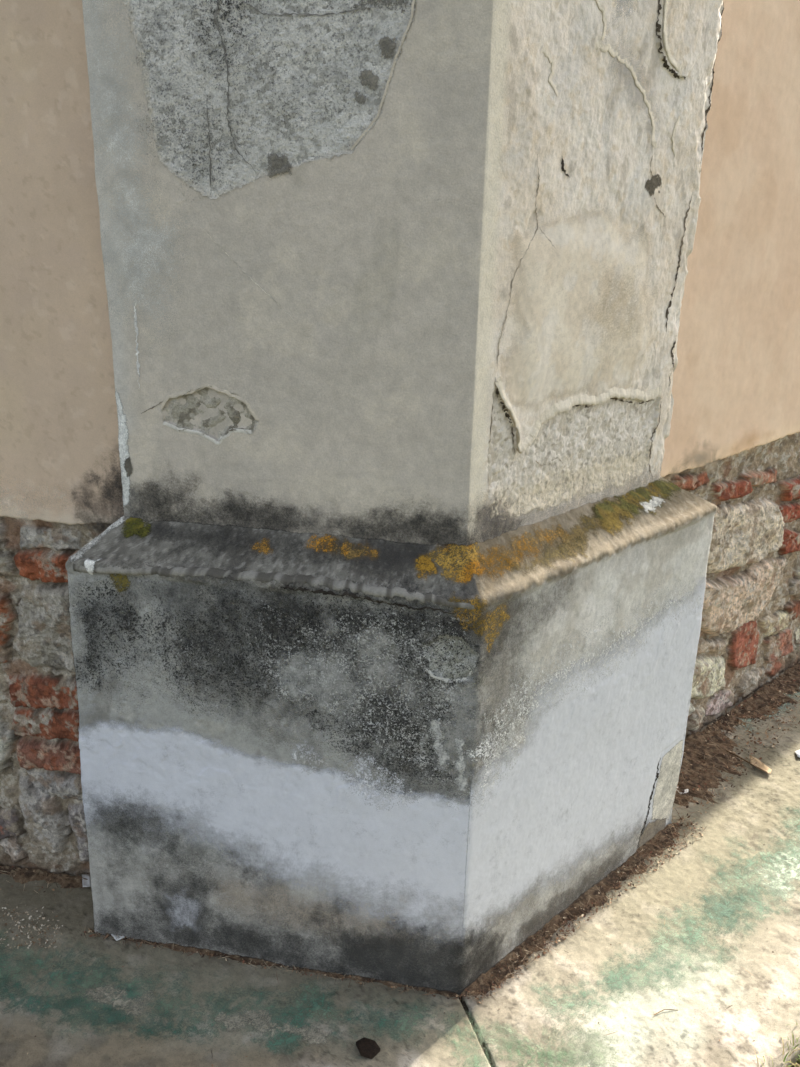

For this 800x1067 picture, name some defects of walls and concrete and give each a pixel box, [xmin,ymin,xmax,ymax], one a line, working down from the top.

spalling [123,0,417,199]
crack [656,0,686,80]
crack [700,5,724,169]
crack [497,154,570,364]
crack [666,196,692,386]
spalling [70,384,477,614]
water stain [83,431,775,575]
peeling [488,377,663,520]
water stain [72,577,566,802]
crack [638,740,683,848]
water stain [102,831,636,1002]